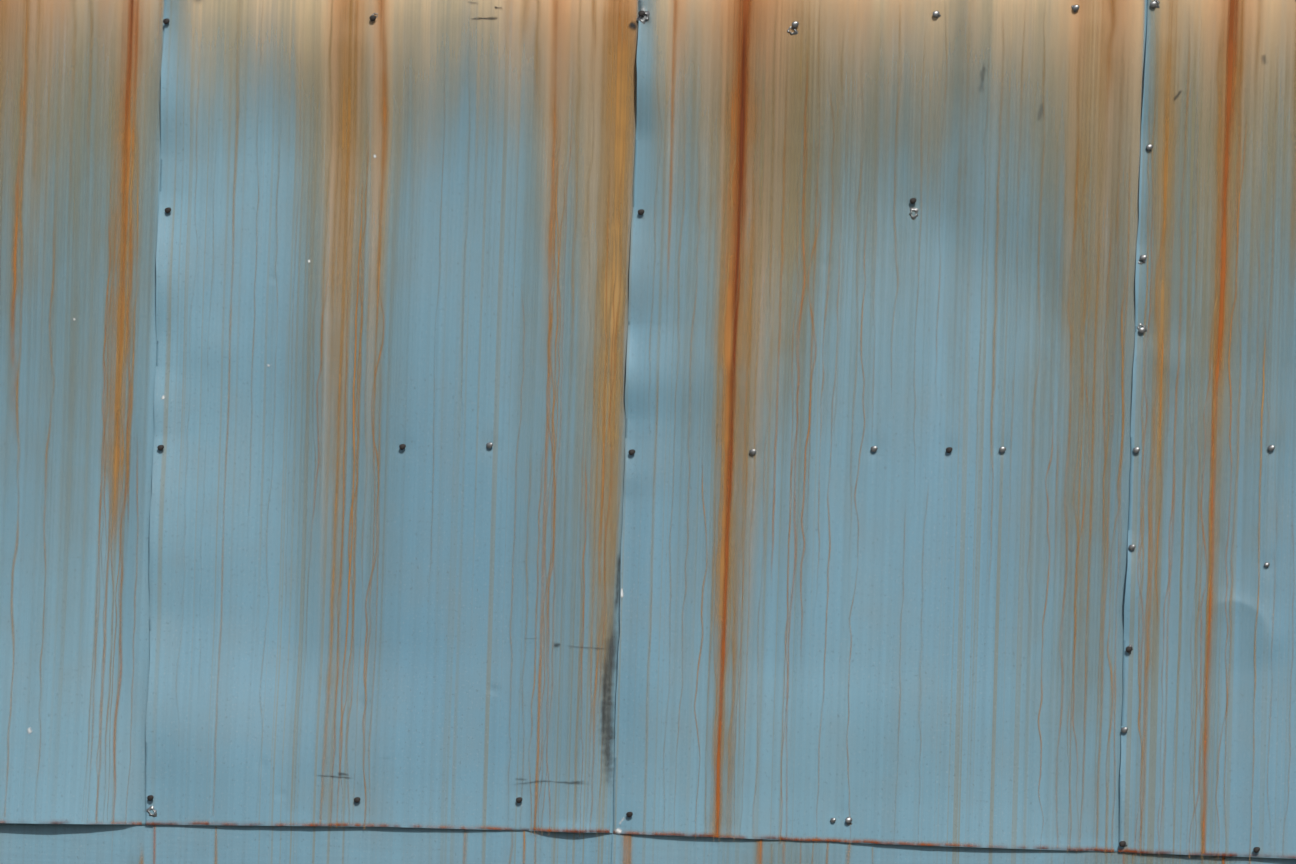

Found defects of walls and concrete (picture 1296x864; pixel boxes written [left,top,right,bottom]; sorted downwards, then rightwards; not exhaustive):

corrosion [13,180,22,307]
corrosion [104,0,138,528]
corrosion [331,207,383,710]
corrosion [545,104,562,477]
corrosion [586,0,632,519]
corrosion [655,0,976,864]
corrosion [1196,0,1244,757]
corrosion [524,657,639,864]
corrosion [1195,812,1237,864]